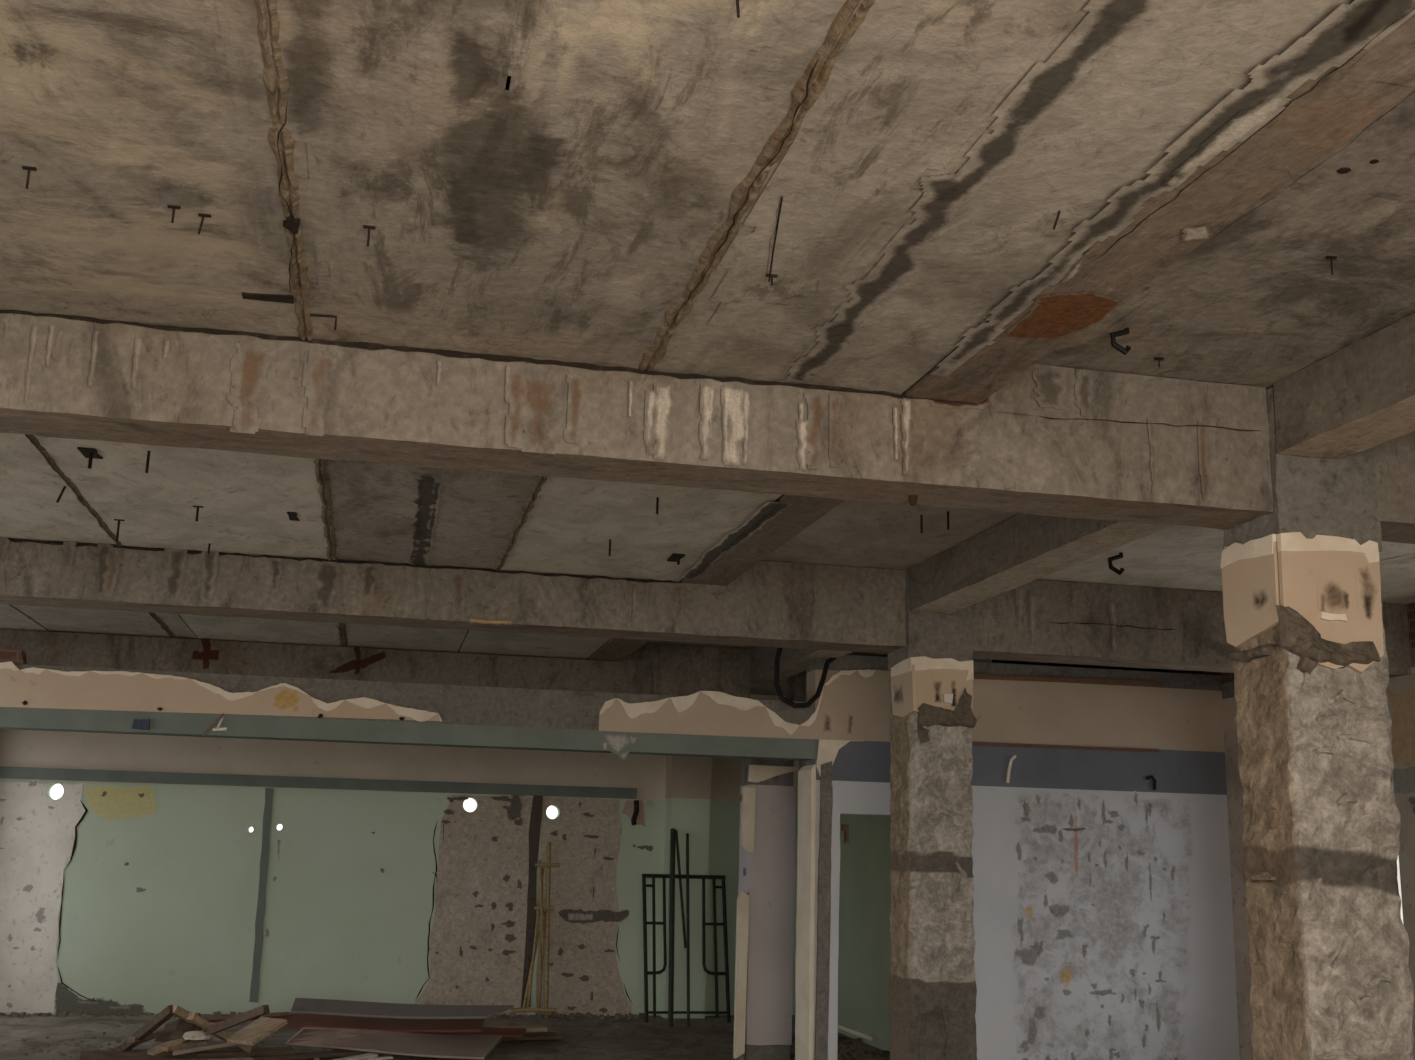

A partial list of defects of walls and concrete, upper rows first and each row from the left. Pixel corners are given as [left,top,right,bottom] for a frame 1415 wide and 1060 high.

leakage [62,0,780,344]
crack [673,58,819,323]
leakage [708,0,1164,383]
leakage [931,0,1415,377]
leakage [628,380,674,460]
leakage [699,383,751,466]
rust [1004,292,1125,340]
peeling [0,646,442,722]
peeling [599,669,891,777]
peeling [0,779,159,1015]
peeling [414,795,654,1016]
peeling [1007,788,1196,1060]